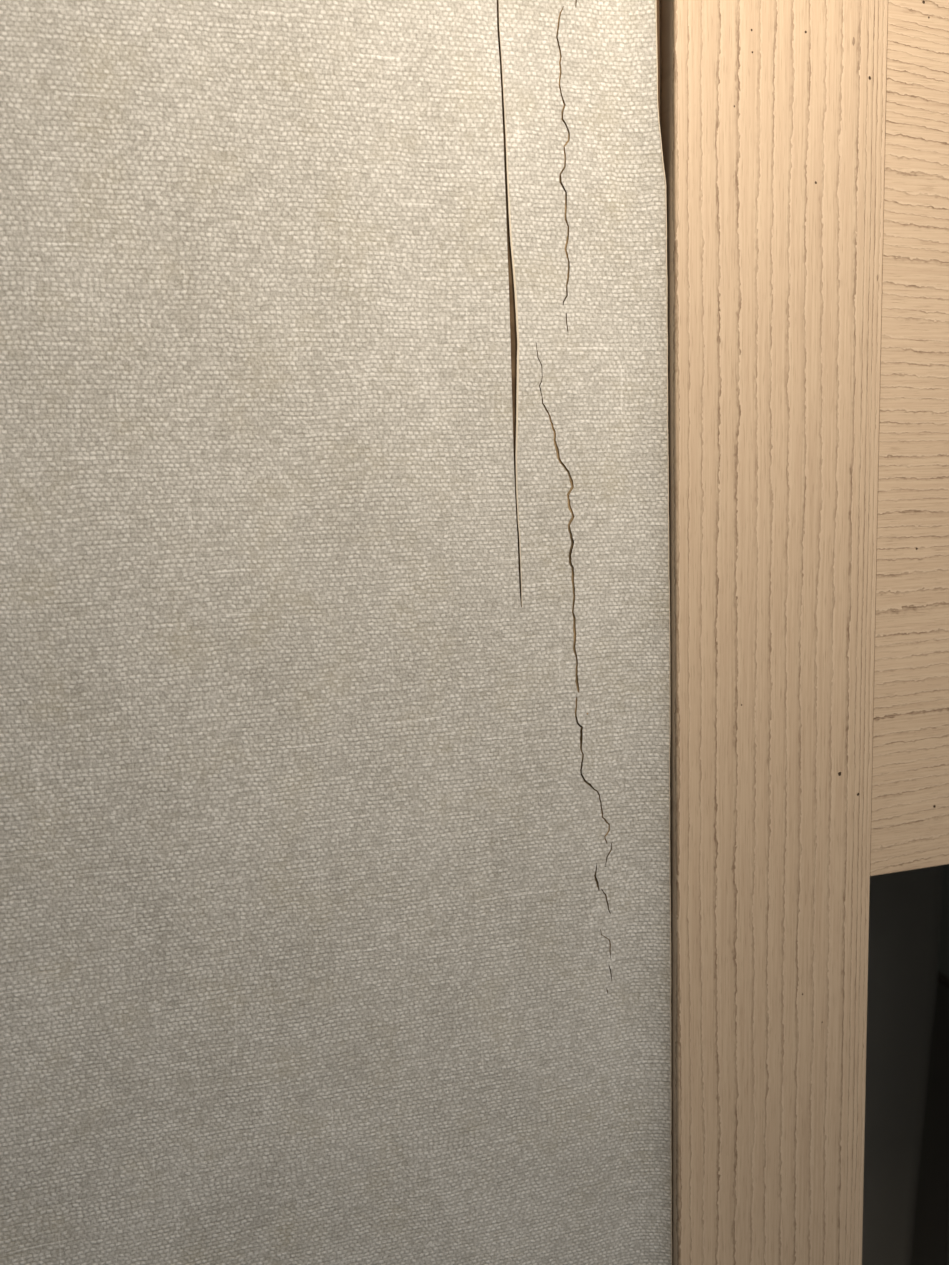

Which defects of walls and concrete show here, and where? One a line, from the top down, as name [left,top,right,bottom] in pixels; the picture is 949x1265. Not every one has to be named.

crack [556,0,577,341]
crack [536,344,612,993]